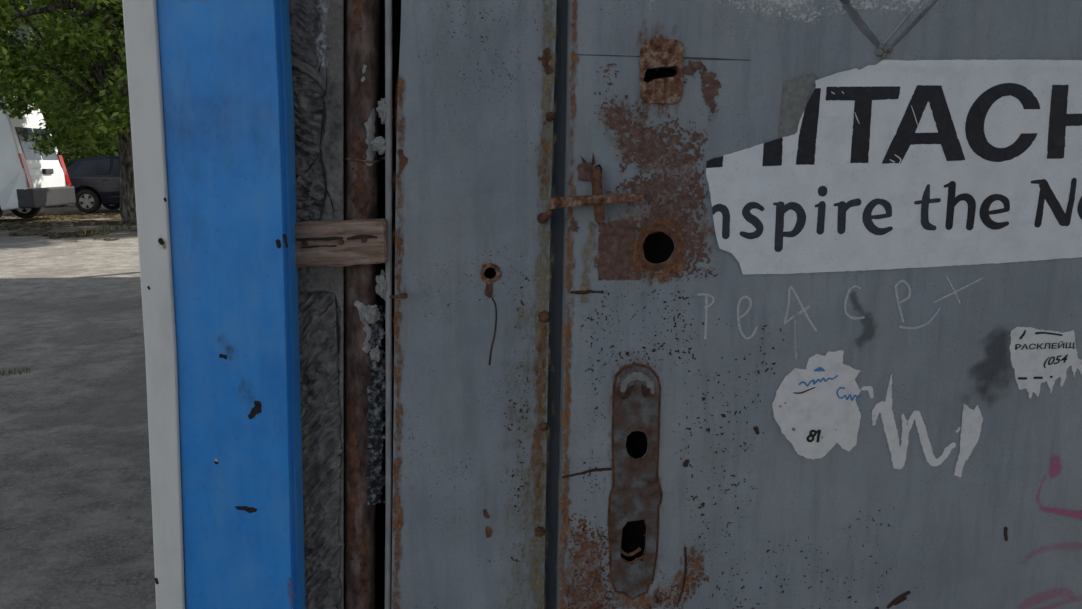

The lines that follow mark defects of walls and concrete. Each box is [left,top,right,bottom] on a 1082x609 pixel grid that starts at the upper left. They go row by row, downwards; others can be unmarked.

rust [395,78,408,208]
rust [538,6,556,210]
rust [569,0,579,137]
rust [394,230,403,438]
rust [480,263,502,284]
rust [565,160,594,302]
peeling [248,401,262,419]
rust [392,458,403,609]
rust [522,223,553,609]
rust [556,308,571,609]
rust [607,363,703,609]